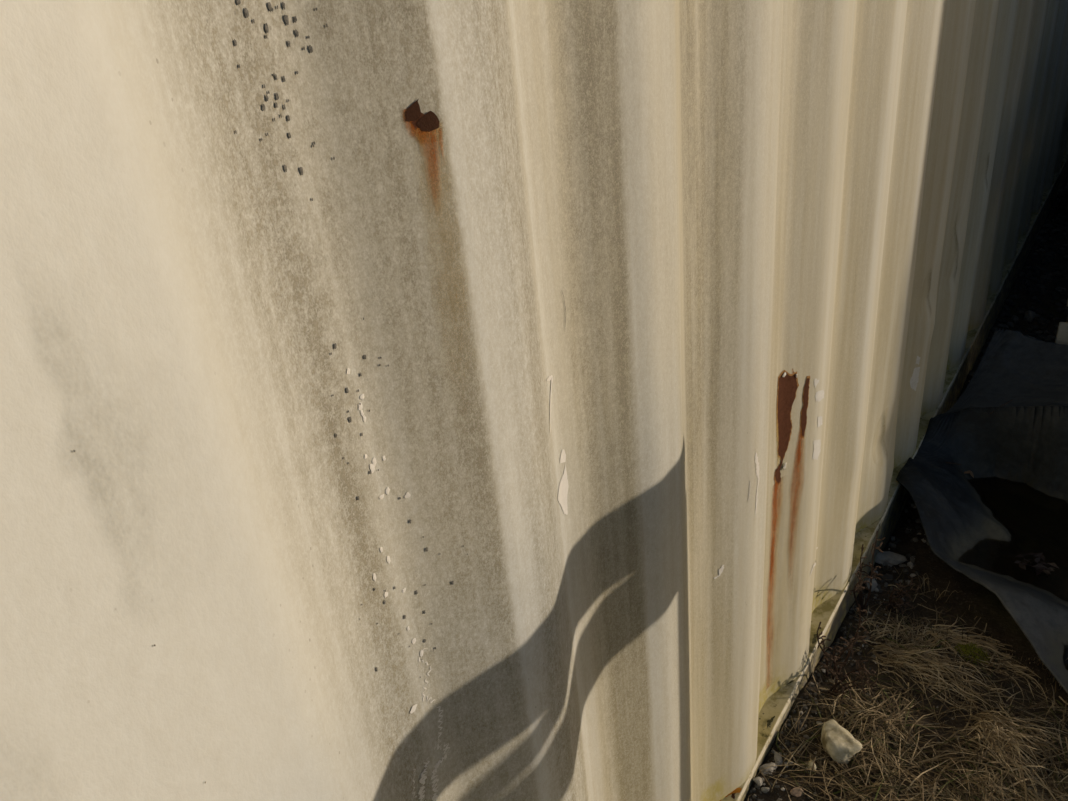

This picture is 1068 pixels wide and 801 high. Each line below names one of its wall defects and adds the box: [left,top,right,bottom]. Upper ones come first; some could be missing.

water stain [237,0,313,53]
water stain [262,71,298,138]
corrosion [404,99,443,181]
corrosion [790,376,810,546]